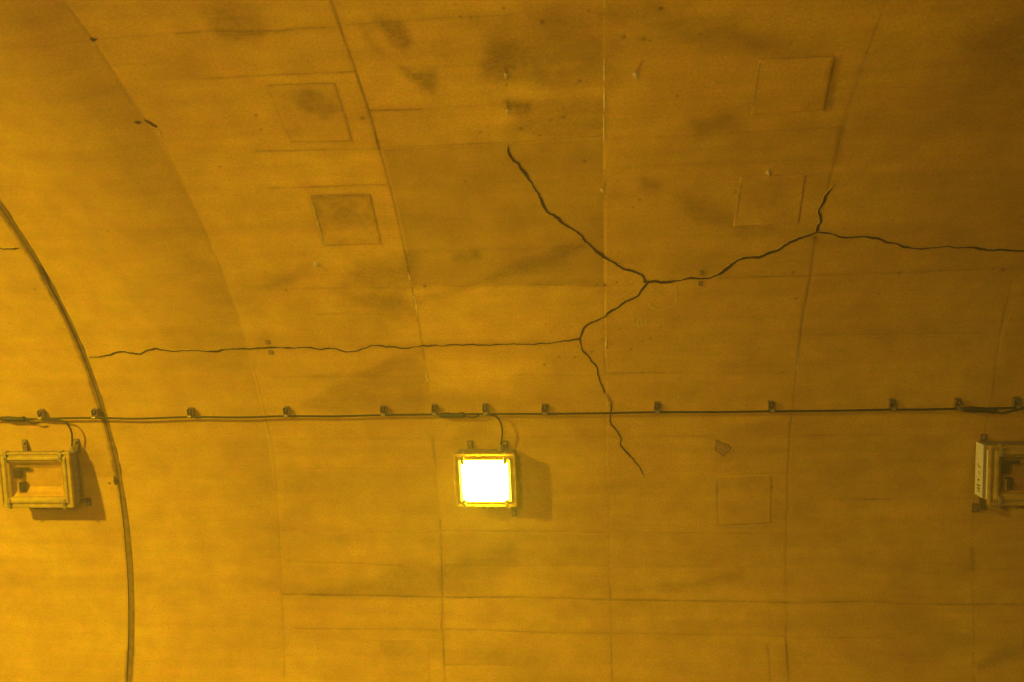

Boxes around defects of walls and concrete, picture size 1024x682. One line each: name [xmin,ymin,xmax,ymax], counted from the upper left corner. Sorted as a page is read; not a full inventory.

crack [87,144,1024,477]